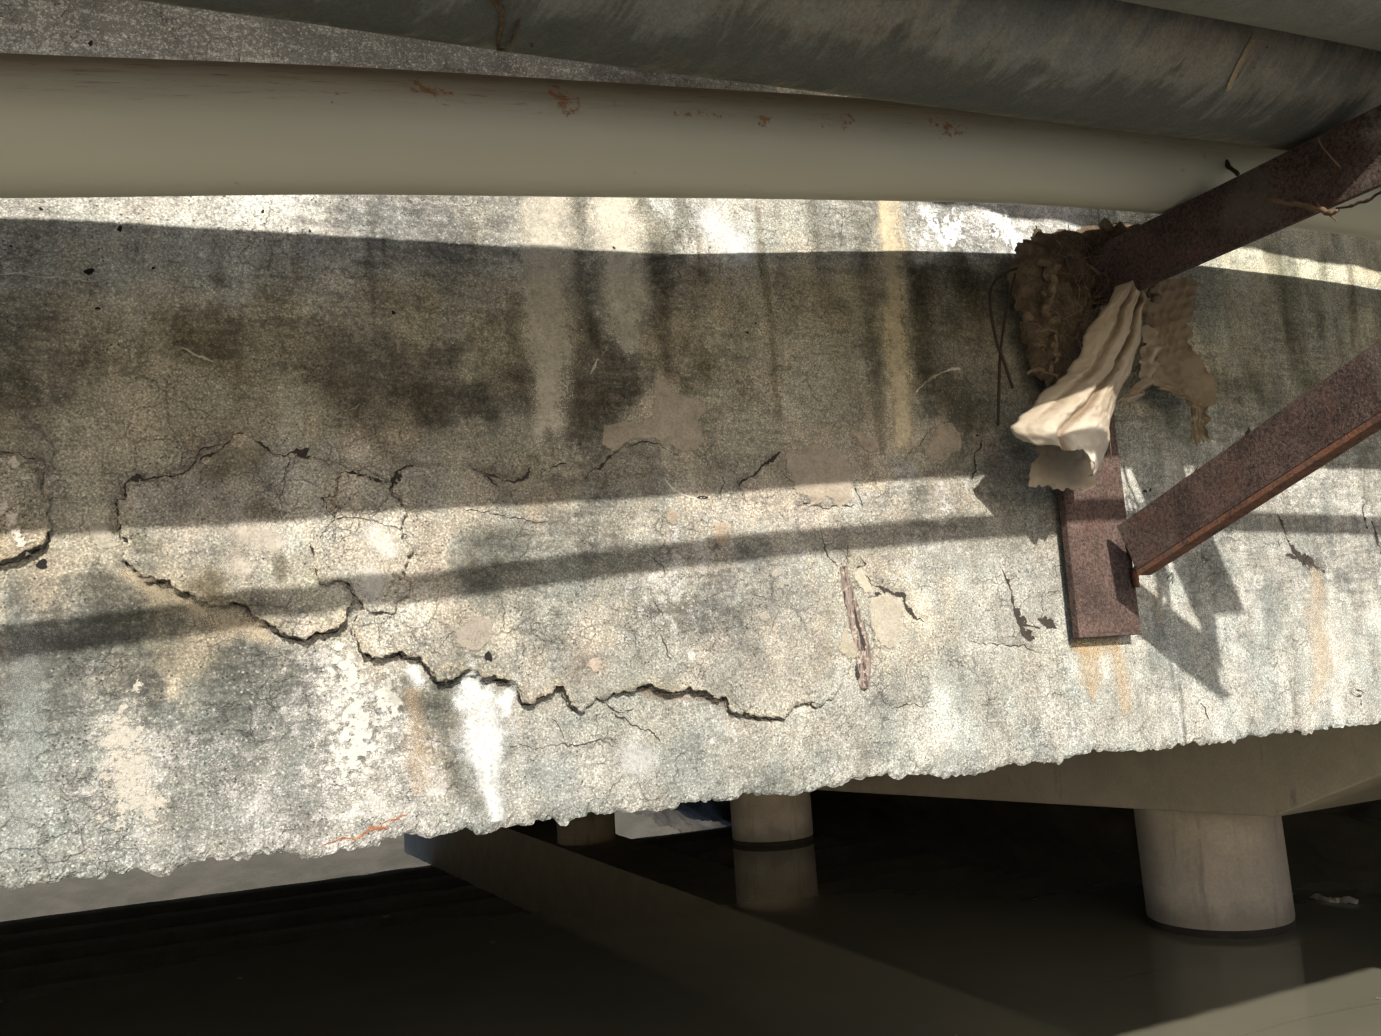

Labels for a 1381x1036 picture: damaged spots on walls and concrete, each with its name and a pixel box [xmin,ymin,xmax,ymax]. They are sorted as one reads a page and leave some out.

leakage [597,197,641,349]
leakage [701,211,753,262]
leakage [879,201,1033,448]
crack [115,432,416,539]
peeling [90,433,904,721]
crack [466,440,679,523]
flaking render [602,377,705,452]
crack [644,547,671,659]
crack [719,451,924,622]
leakage [89,679,186,843]
leakage [295,623,425,817]
leakage [453,664,516,822]